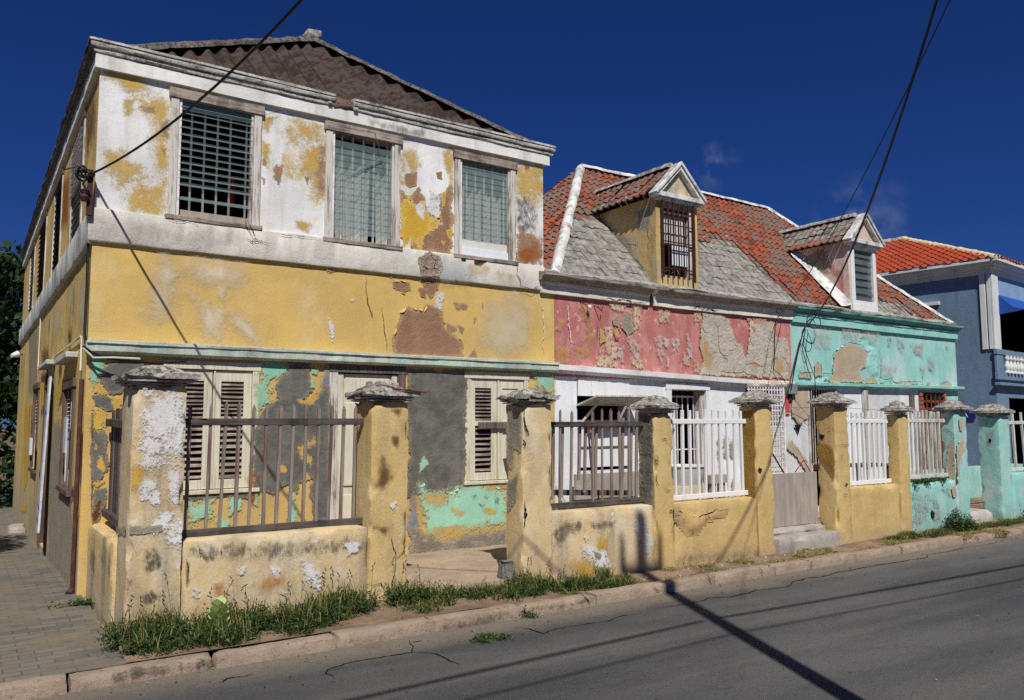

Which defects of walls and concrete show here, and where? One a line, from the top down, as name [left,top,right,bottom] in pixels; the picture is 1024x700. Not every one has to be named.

peeling [103,71,219,216]
peeling [261,97,359,201]
flaking render [389,147,543,358]
peeling [595,294,679,369]
flaking render [21,355,122,586]
water stain [134,386,367,582]
peeling [301,559,323,591]
peeling [343,539,360,556]
peeling [407,404,530,554]
peeling [577,535,611,577]
flaking render [683,311,952,498]